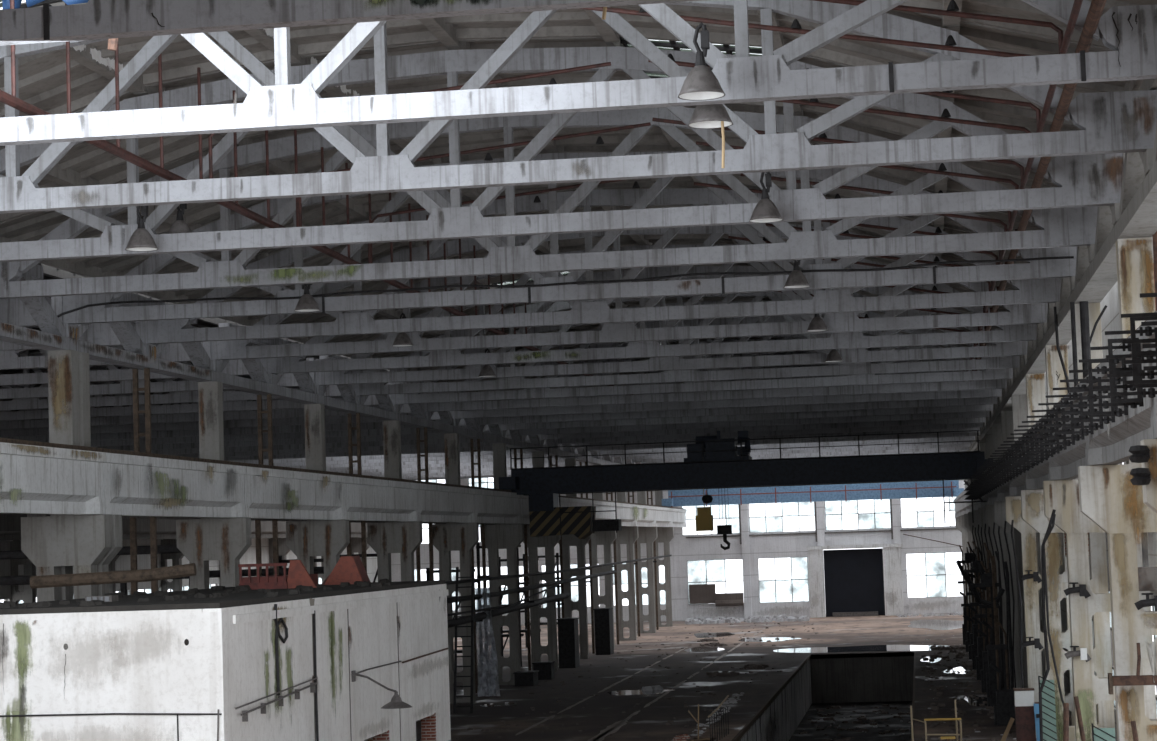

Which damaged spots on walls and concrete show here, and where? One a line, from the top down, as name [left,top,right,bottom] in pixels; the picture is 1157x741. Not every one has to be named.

rust [1120,240,1154,330]
rust [2,323,210,424]
water stain [149,465,186,509]
rust [1103,446,1157,596]
water stain [0,623,31,741]
water stain [264,607,293,709]
water stain [329,612,342,711]
rust [1119,689,1157,741]